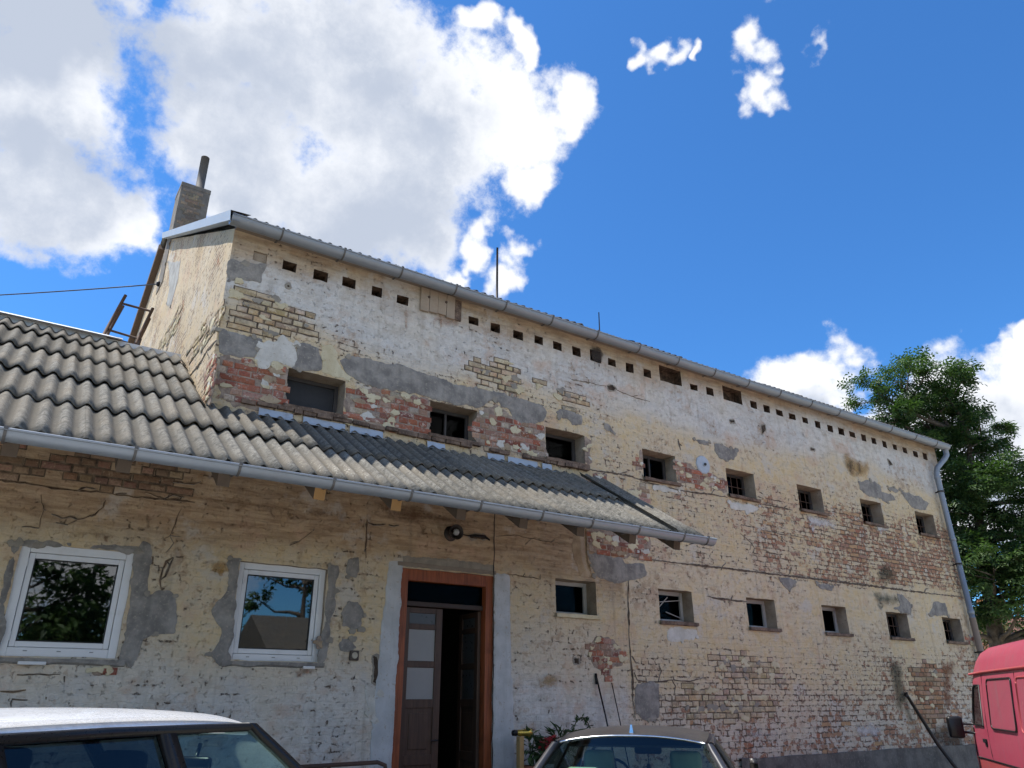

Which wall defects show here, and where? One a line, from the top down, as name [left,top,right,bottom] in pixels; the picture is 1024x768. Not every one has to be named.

spalling [186,278,319,412]
spalling [343,387,432,434]
spalling [468,404,548,462]
spalling [464,356,590,420]
spalling [0,441,194,497]
spalling [672,459,731,504]
crack [1,479,201,590]
spalling [586,528,652,567]
crack [627,504,962,719]
spalling [573,636,628,682]
spalling [659,650,787,725]
spalling [907,659,947,729]